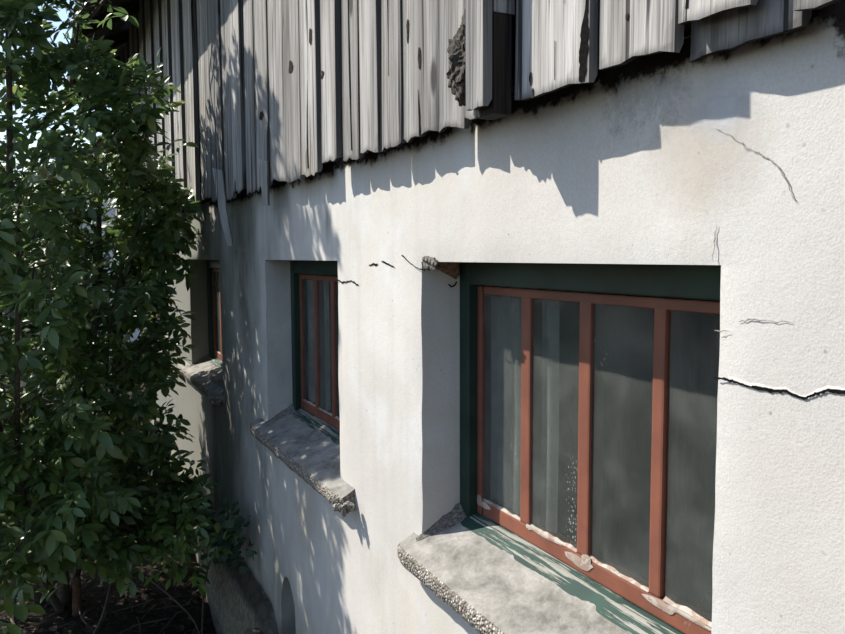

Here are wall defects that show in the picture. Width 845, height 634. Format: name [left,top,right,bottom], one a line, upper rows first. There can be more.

damp [753,0,845,47]
damp [512,37,735,114]
damp [471,118,501,133]
crack [715,128,796,203]
crack [369,255,425,271]
crack [714,318,792,332]
crack [714,376,845,400]
peeling [526,524,593,571]
peeling [642,594,712,631]